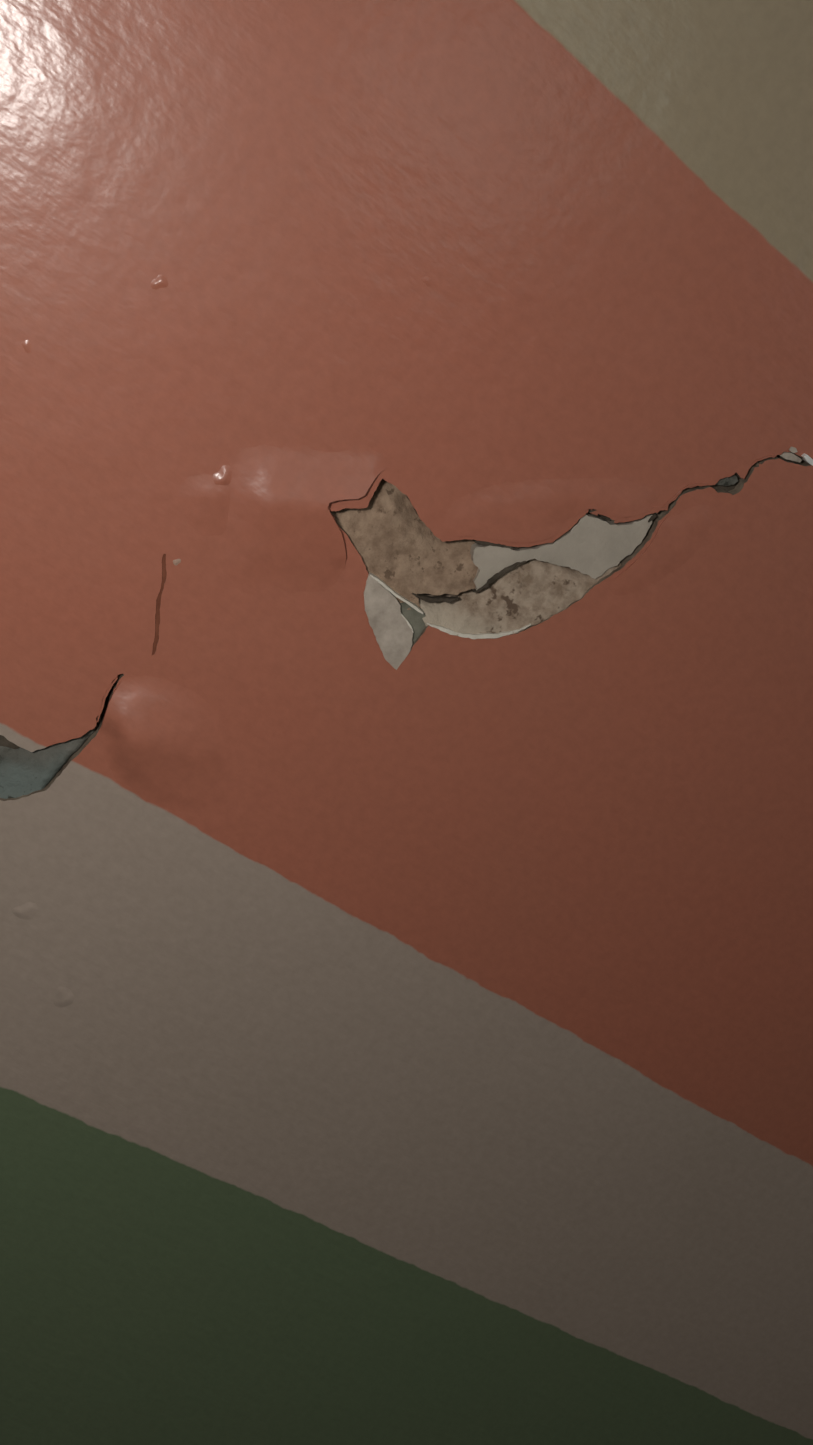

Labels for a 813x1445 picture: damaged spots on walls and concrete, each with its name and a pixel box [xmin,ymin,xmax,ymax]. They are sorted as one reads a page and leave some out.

crack [652,447,813,515]
crack [152,554,167,655]
flaking render [332,479,657,670]
crack [97,675,119,726]
flaking render [0,723,98,799]